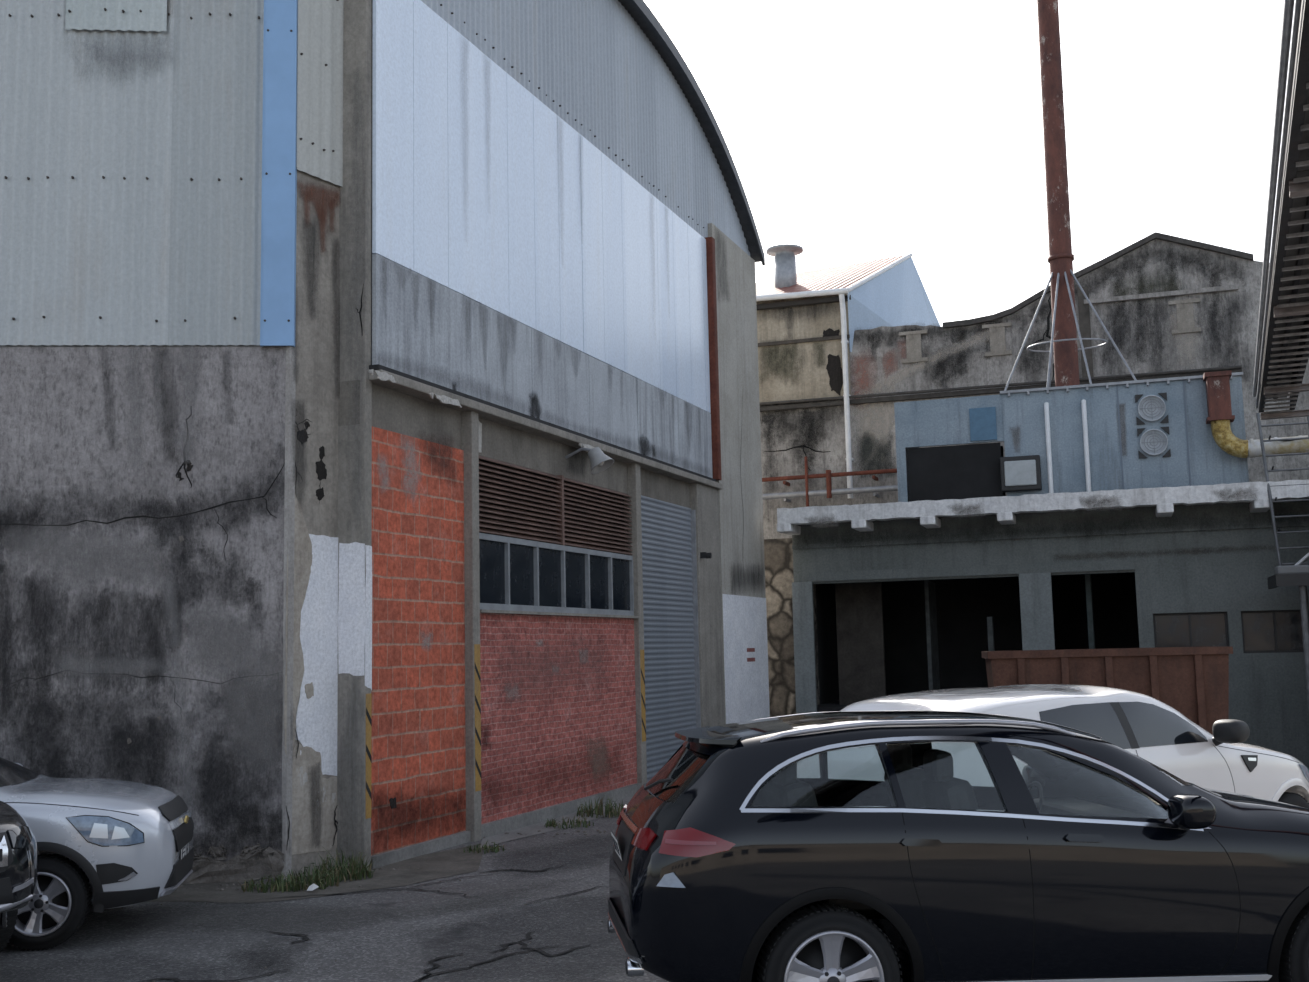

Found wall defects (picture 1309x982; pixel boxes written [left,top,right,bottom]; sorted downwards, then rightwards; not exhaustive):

corrosion [301,185,339,249]
leakage [853,302,1052,380]
leakage [1074,248,1243,367]
crack [1,406,321,561]
spalling [297,421,327,501]
leakage [766,400,842,486]
leakage [860,435,891,477]
leakage [0,411,305,787]
peeling [181,495,337,884]
leakage [193,680,282,860]